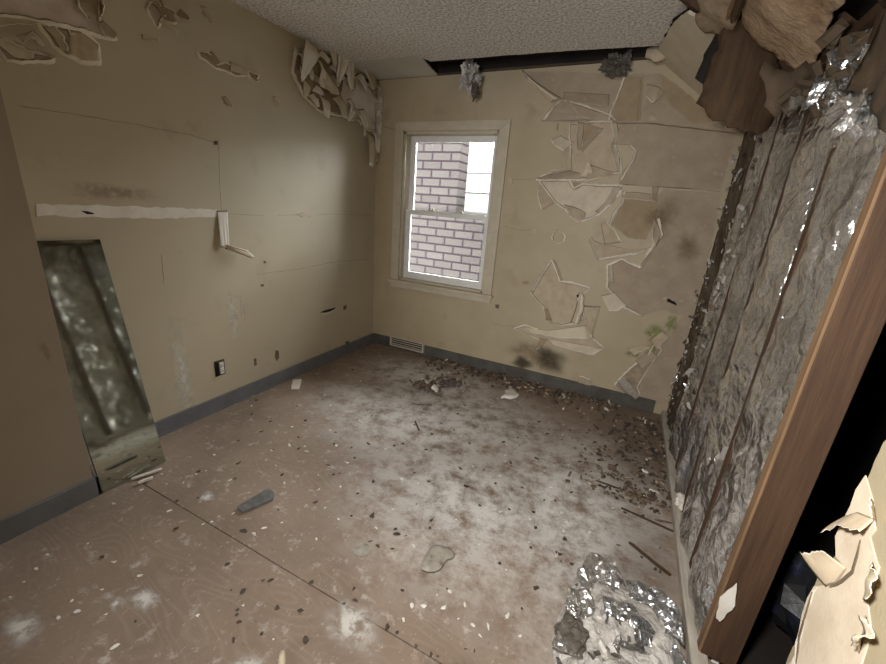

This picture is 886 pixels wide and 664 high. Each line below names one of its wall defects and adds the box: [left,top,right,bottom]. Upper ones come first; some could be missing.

peeling [0,0,118,66]
peeling [141,0,190,41]
peeling [195,50,260,82]
peeling [291,38,383,167]
peeling [514,70,736,405]
peeling [789,475,880,664]